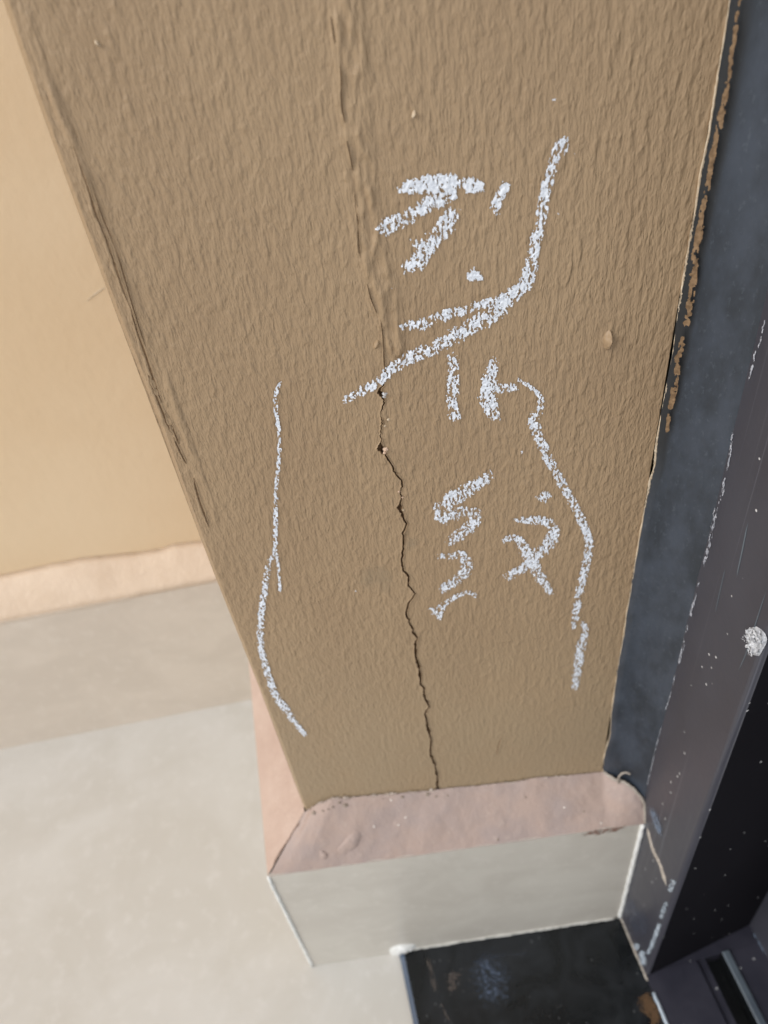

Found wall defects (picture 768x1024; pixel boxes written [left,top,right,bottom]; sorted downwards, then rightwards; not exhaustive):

crack [328,17,336,43]
crack [339,67,361,258]
crack [367,284,441,790]